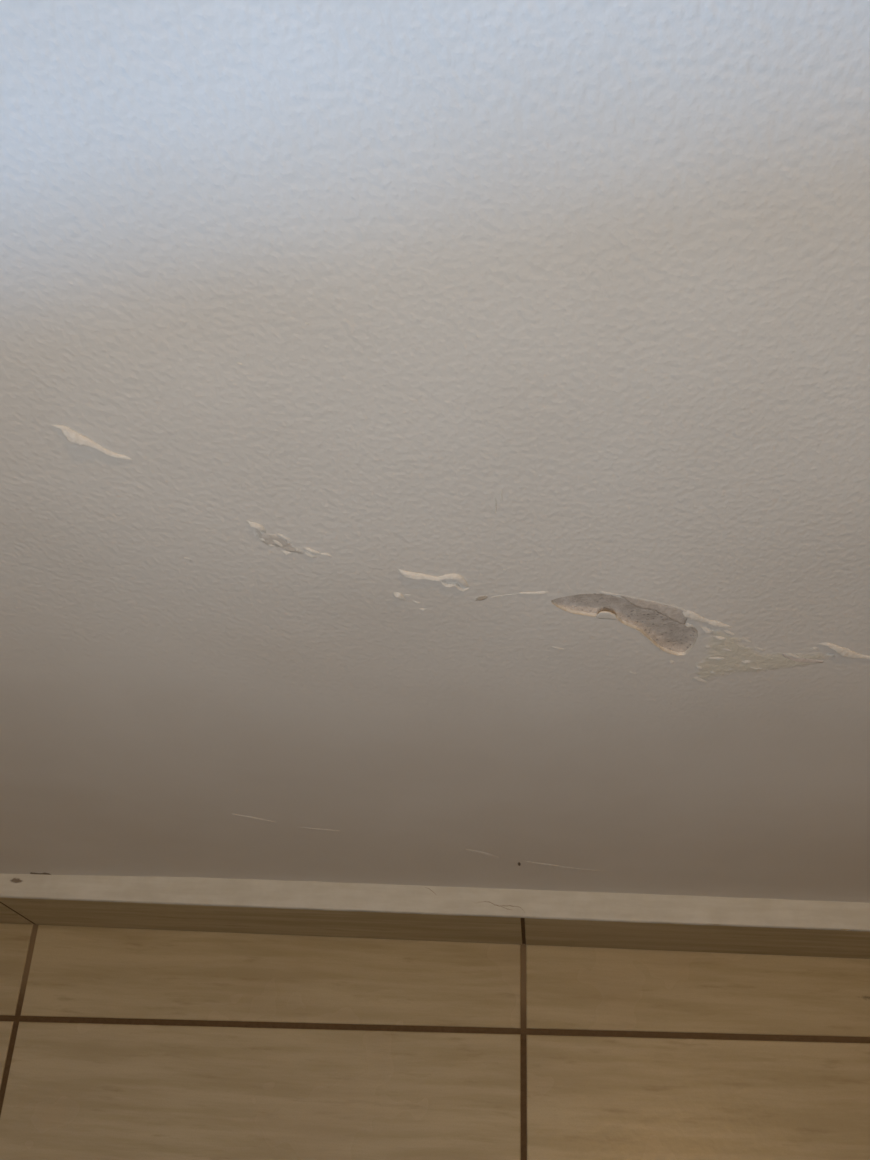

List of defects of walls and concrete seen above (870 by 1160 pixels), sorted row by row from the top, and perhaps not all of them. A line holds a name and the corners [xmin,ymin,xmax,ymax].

peeling [48,424,144,474]
peeling [398,569,490,602]
flaking render [551,591,736,660]